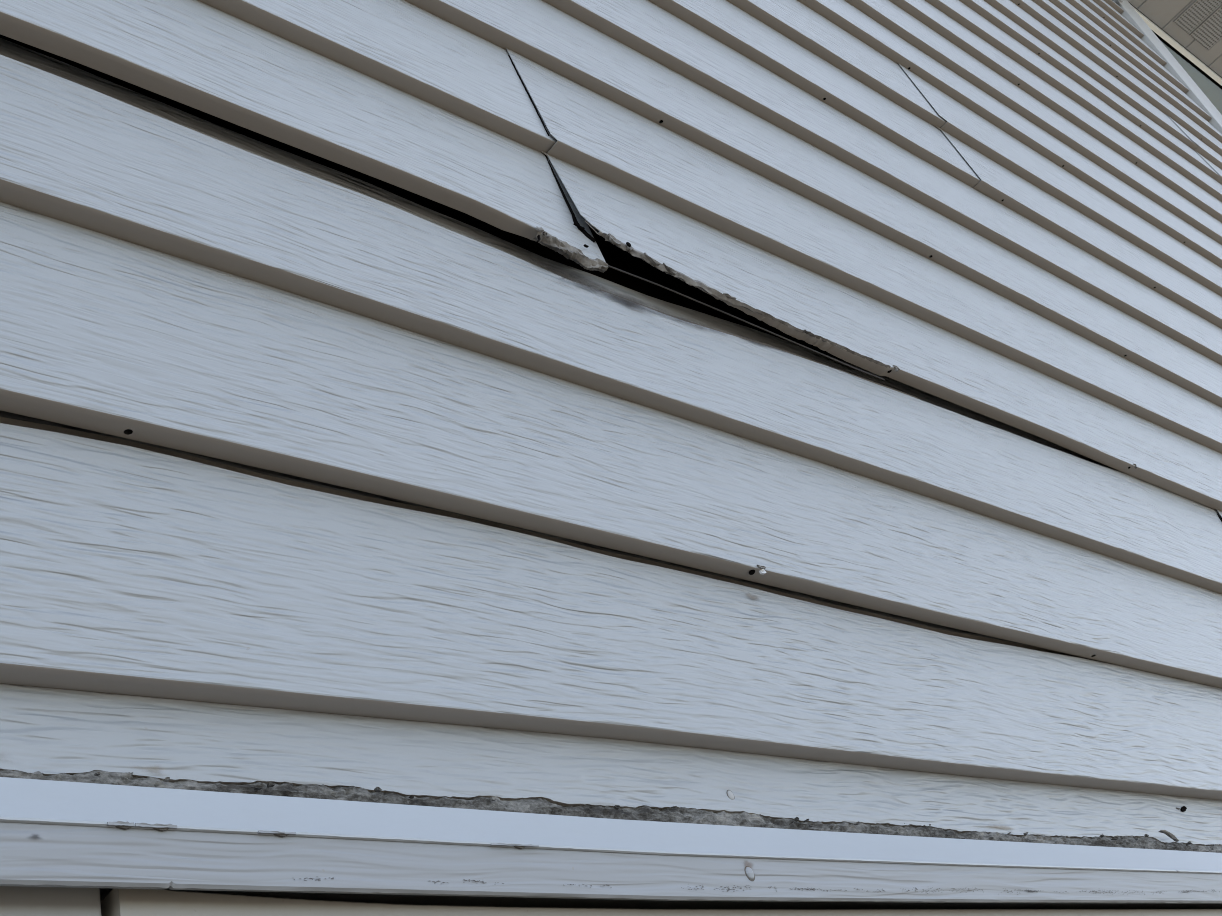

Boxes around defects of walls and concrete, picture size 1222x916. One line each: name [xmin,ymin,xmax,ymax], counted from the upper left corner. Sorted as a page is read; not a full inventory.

crack [508,55,596,242]
spalling [605,233,900,373]